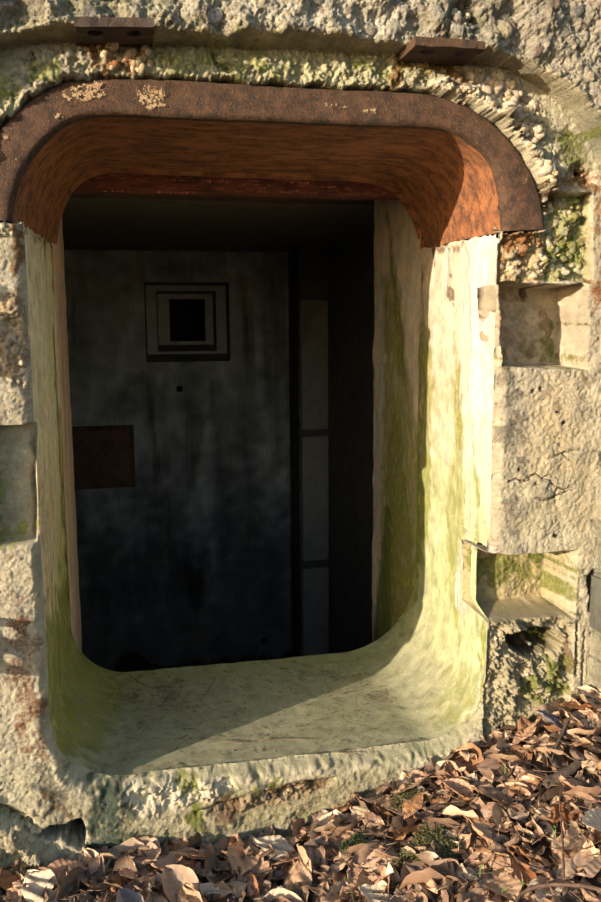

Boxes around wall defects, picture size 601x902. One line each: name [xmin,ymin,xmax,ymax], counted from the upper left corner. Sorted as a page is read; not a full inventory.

spalling [425,54,598,285]
corrosion [575,173,601,232]
damp [487,249,496,290]
spalling [0,292,32,396]
damp [487,311,502,395]
crack [508,449,578,503]
damp [373,419,420,641]
damp [455,481,479,624]
corrosion [4,593,49,765]
spalling [484,597,575,724]
damp [87,785,119,849]